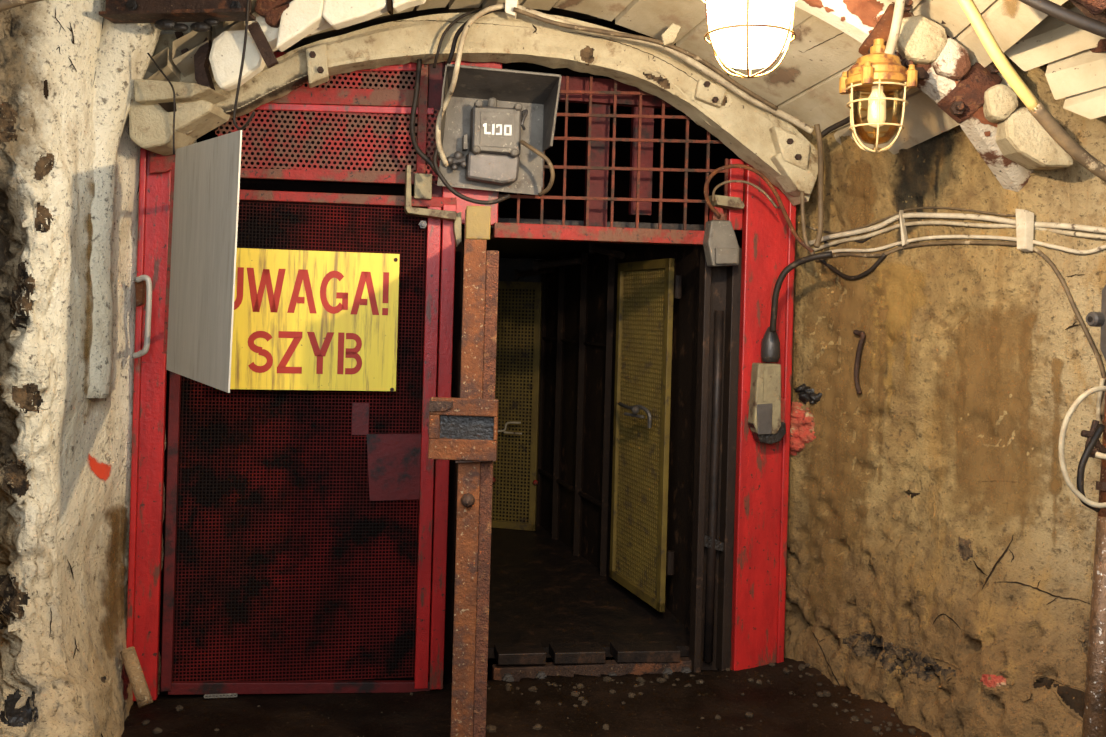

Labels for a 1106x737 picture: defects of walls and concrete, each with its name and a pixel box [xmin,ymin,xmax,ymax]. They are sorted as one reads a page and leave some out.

crack [974,534,1090,605]